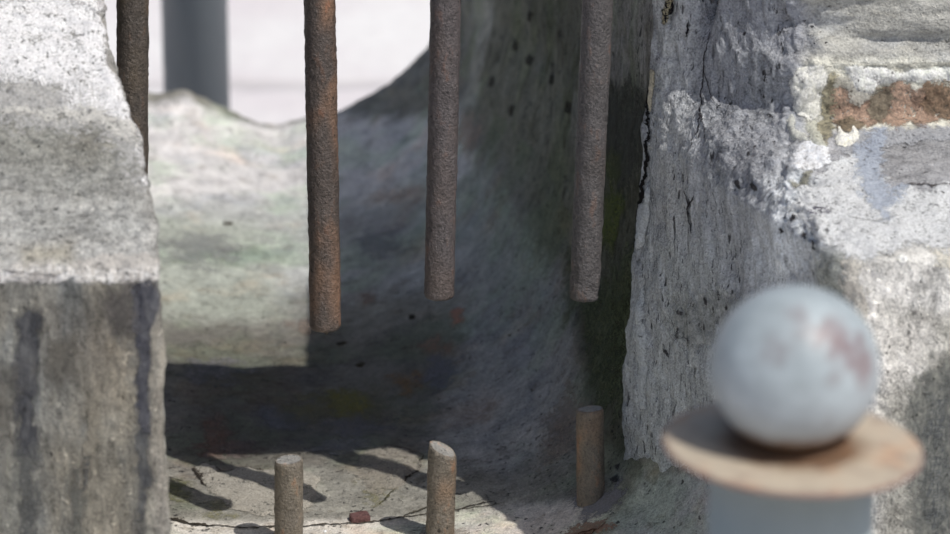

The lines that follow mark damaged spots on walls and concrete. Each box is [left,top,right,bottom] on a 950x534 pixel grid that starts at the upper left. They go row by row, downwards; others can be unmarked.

damp [0,0,151,191]
crack [661,0,714,141]
spalling [737,45,784,122]
spalling [786,72,950,147]
damp [4,249,161,534]
crack [170,518,274,528]
crack [303,507,426,527]
crack [455,501,496,510]